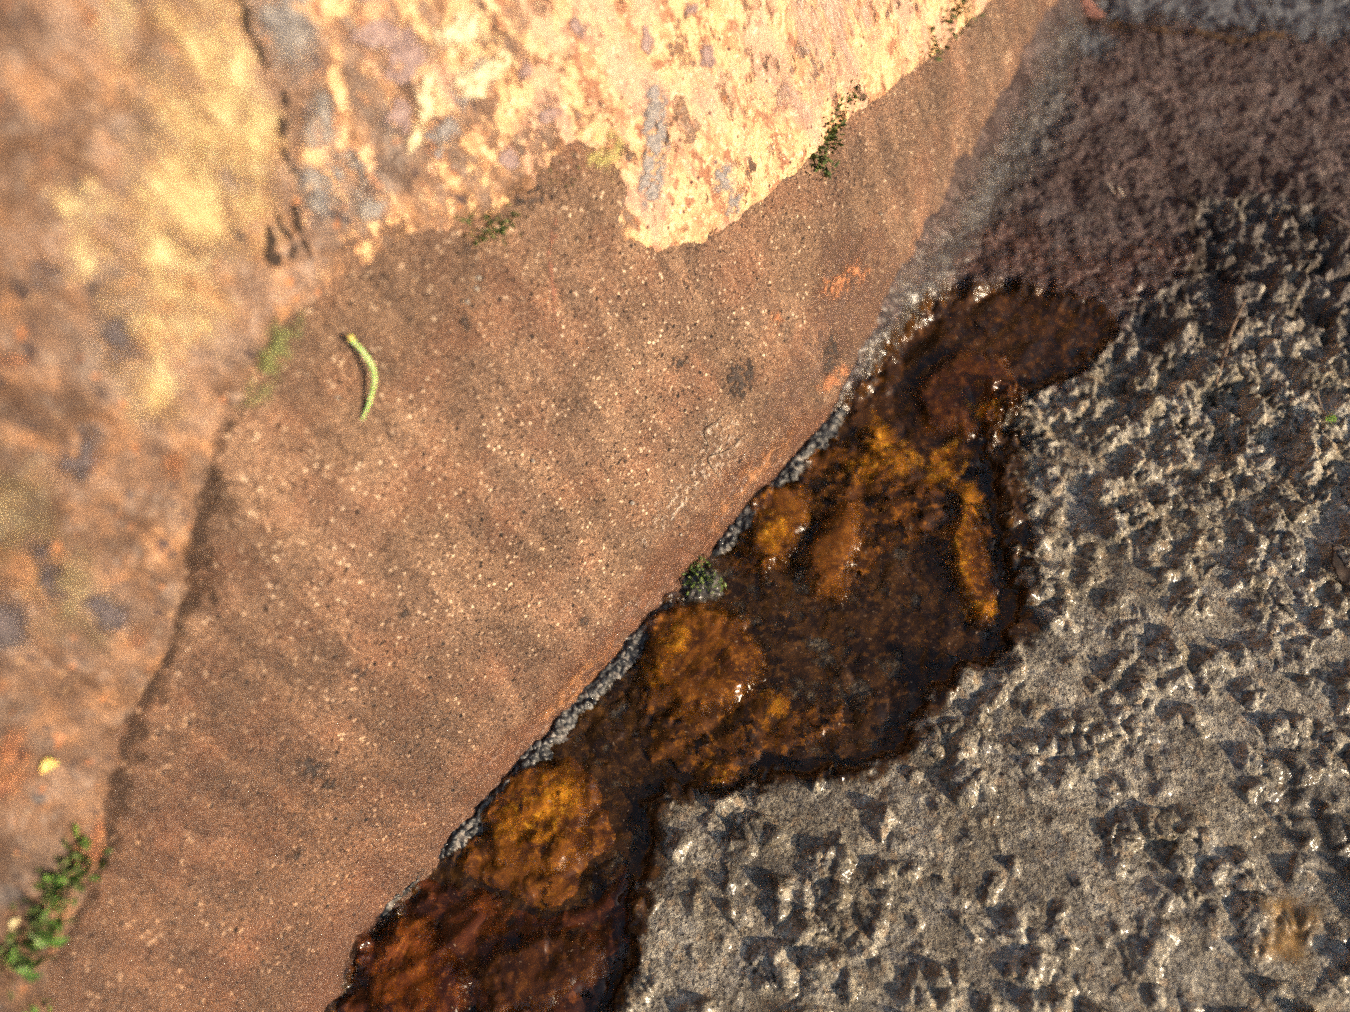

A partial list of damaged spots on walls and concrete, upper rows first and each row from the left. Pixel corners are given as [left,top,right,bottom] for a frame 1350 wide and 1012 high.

corrosion [666,10,716,69]
corrosion [713,0,944,131]
corrosion [707,135,824,240]
corrosion [0,0,702,1012]
corrosion [325,214,1189,1012]